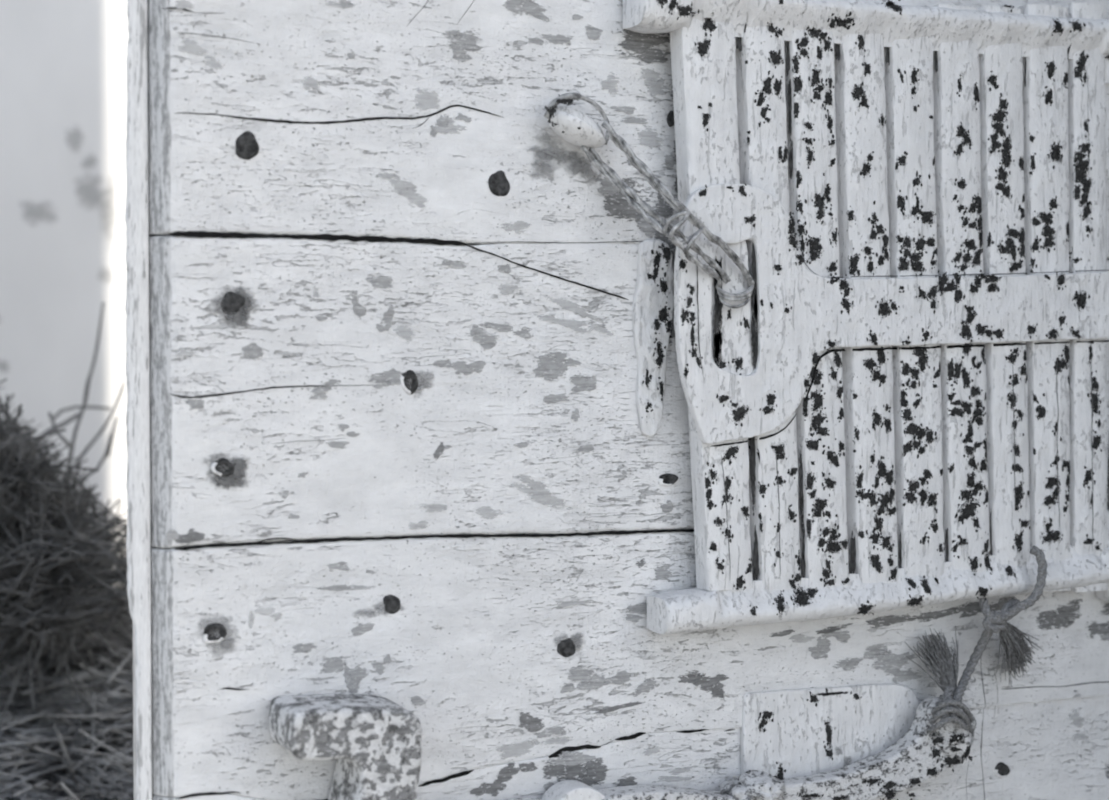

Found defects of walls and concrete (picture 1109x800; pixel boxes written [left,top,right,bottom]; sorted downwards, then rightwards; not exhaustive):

peeling [503,0,603,45]
peeling [615,29,675,126]
crack [181,105,504,129]
crack [169,231,643,300]
peeling [433,322,534,375]
crack [171,385,365,398]
peeling [533,352,596,422]
peeling [561,665,657,714]
peeling [679,670,729,698]
crack [548,732,646,758]
crack [176,791,239,799]
crack [418,770,474,787]